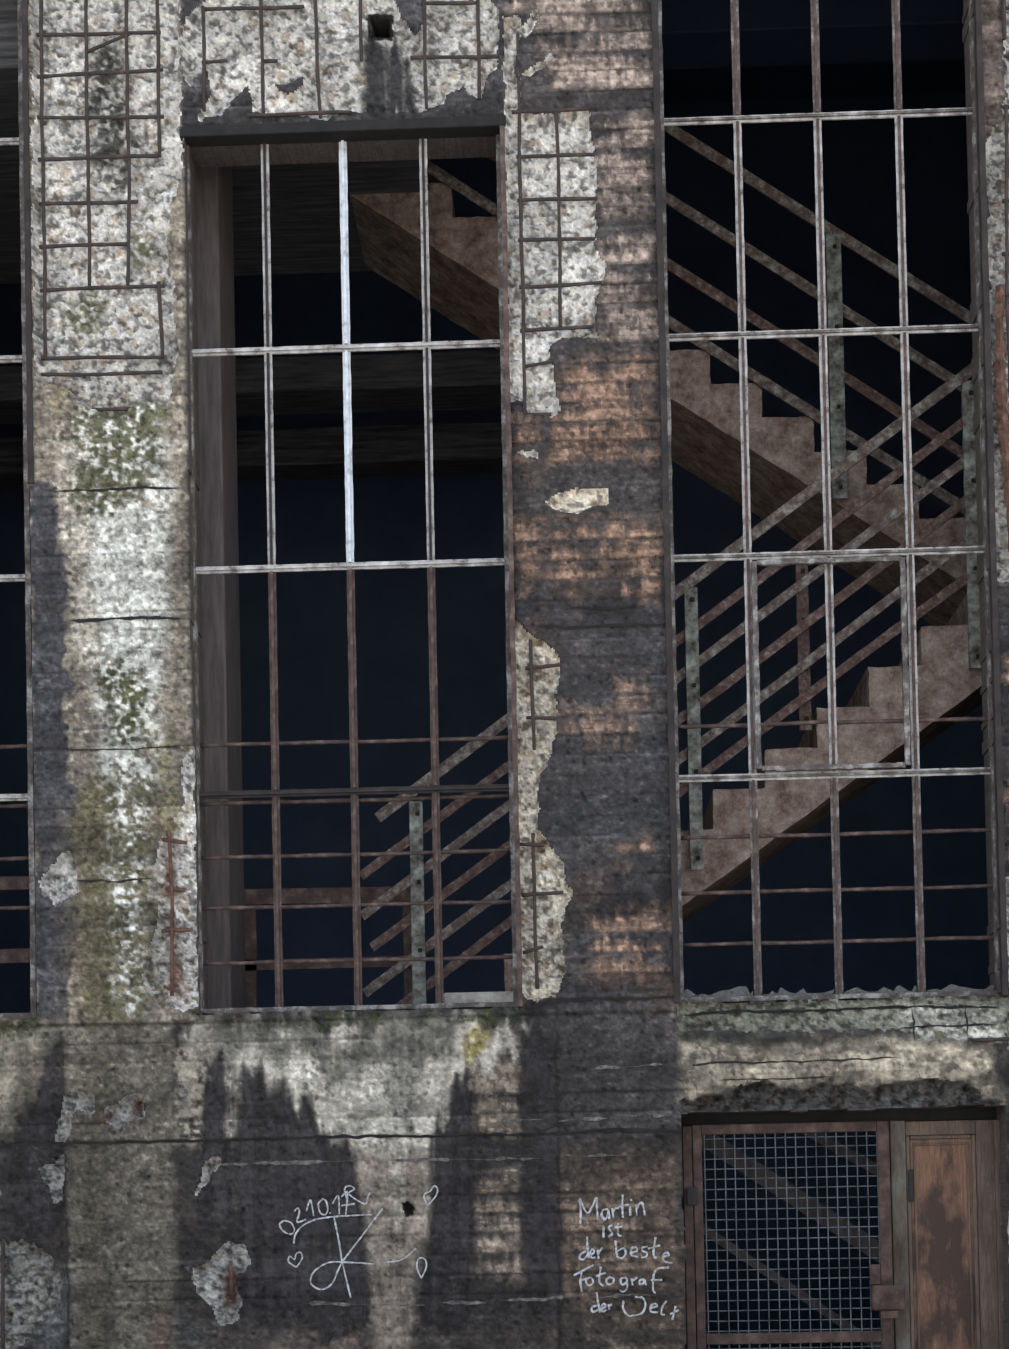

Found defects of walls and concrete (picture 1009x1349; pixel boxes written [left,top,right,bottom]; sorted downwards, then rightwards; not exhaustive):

spalling [29,0,659,461]
spalling [986,0,1009,584]
peeling [513,487,662,595]
leakage [56,401,169,1015]
spalling [515,619,650,1002]
peeling [593,909,669,980]
spalling [676,877,1009,1050]
spalling [679,1078,981,1114]
spalling [0,1239,62,1349]
spalling [191,1241,251,1326]